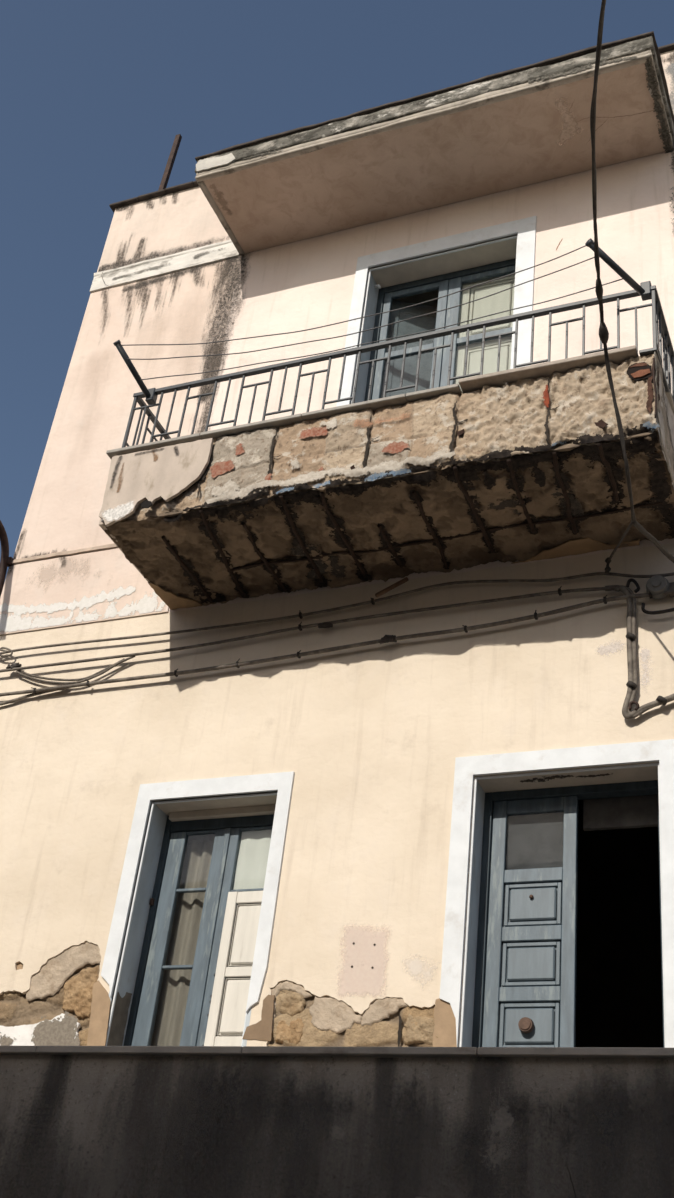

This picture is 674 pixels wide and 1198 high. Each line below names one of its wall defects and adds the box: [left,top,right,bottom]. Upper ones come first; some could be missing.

leakage [98,238,248,433]
spalling [0,351,674,632]
flaking render [0,941,132,1046]
flaking render [242,981,459,1047]
leakage [458,1057,534,1198]